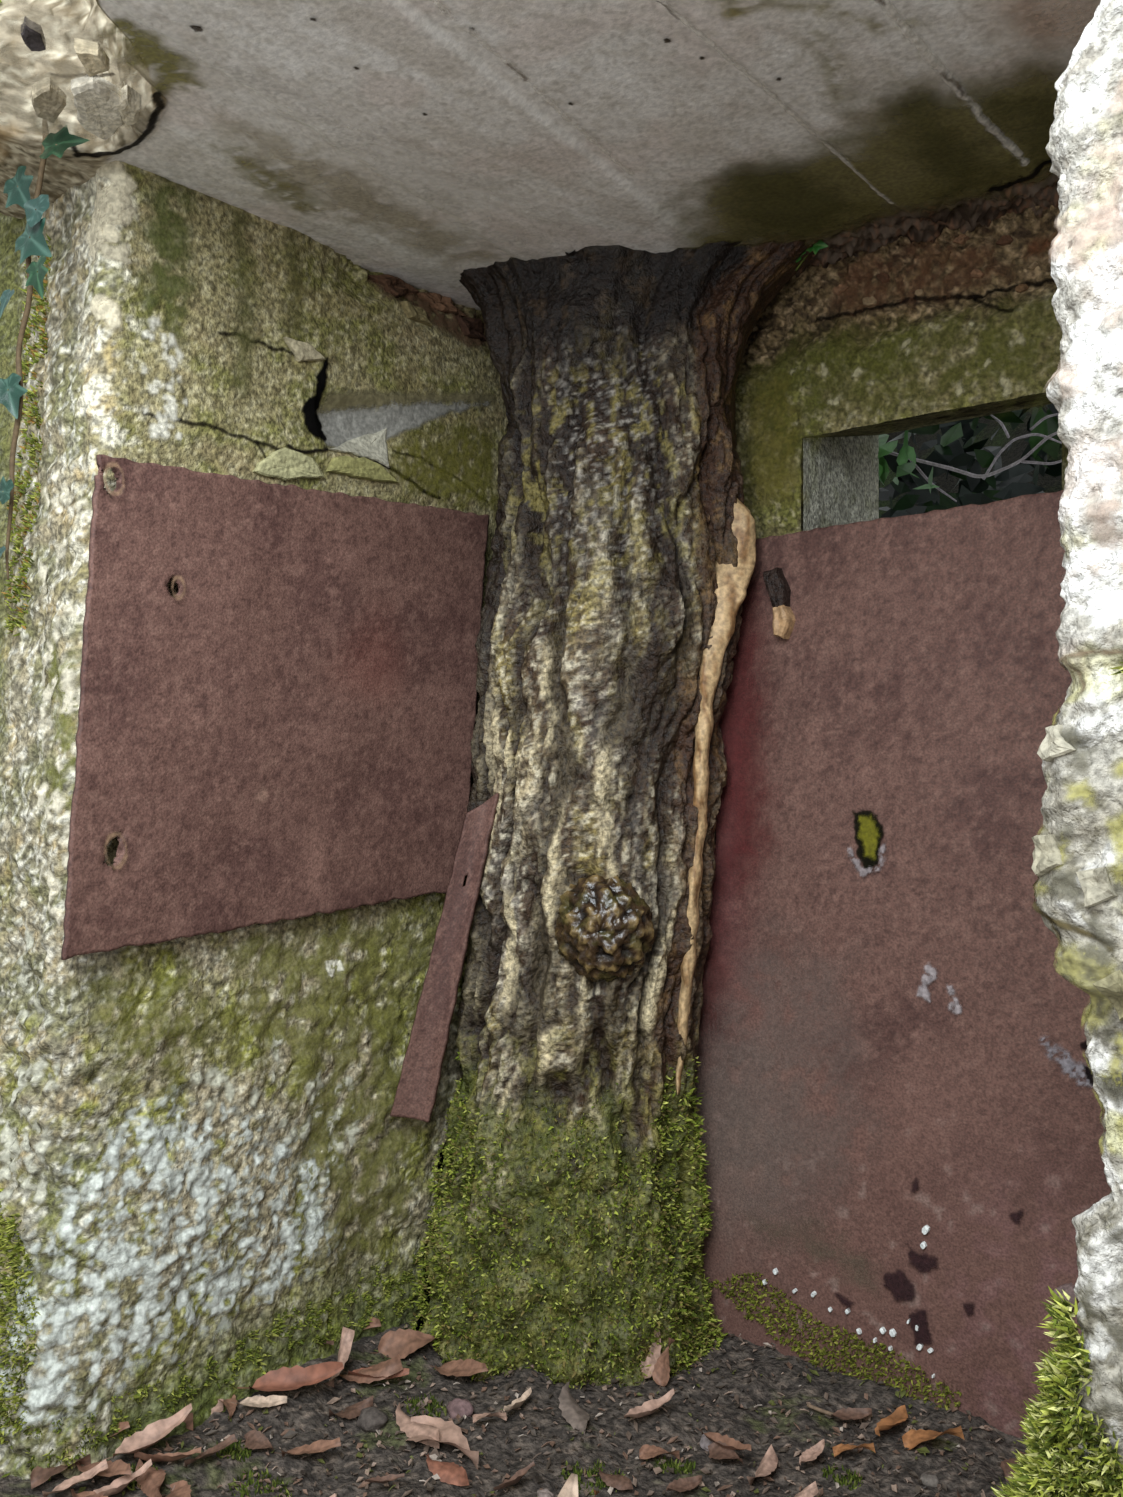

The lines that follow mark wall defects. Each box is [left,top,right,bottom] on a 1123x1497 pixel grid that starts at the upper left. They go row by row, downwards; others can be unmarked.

crack [50,71,115,79]
crack [70,91,166,158]
damp [1026,103,1055,146]
crack [988,160,1052,192]
crack [218,332,306,362]
crack [143,380,280,458]
rust [847,810,885,876]
rust [1041,1037,1094,1086]